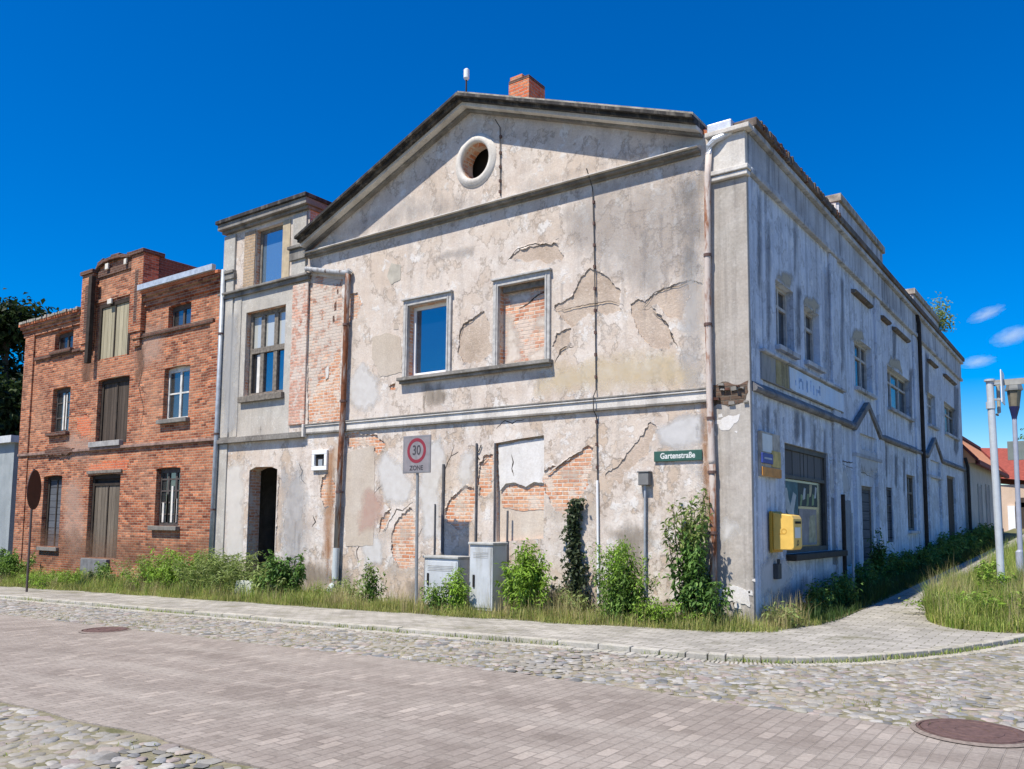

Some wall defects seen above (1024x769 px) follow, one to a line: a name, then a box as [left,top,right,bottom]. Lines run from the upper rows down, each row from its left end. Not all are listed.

flaking render [510,240,564,264]
flaking render [308,275,378,424]
flaking render [458,312,492,365]
flaking render [552,268,703,356]
flaking render [316,455,336,511]
flaking render [346,432,594,572]